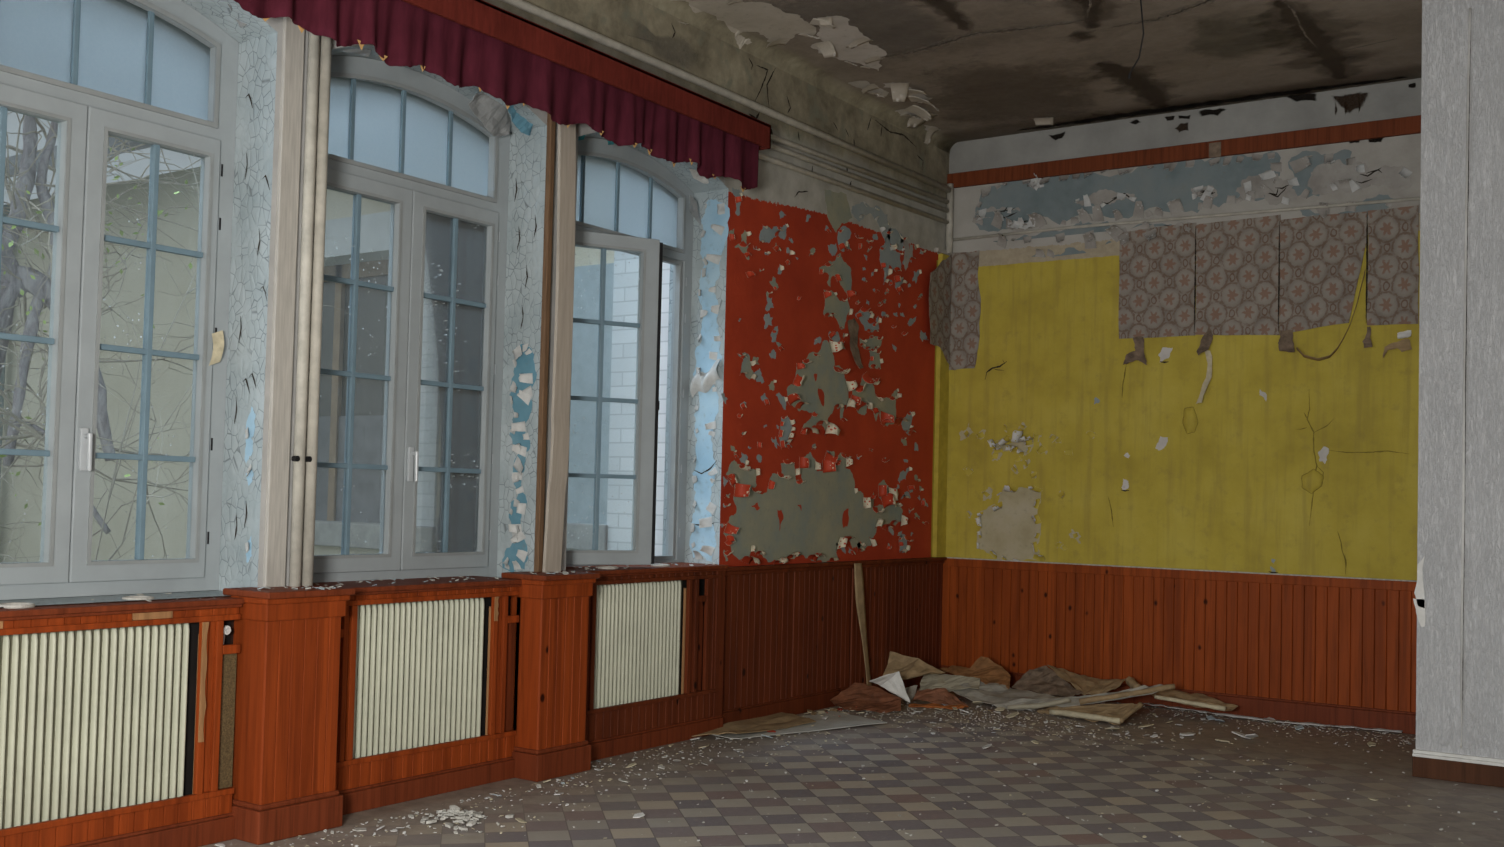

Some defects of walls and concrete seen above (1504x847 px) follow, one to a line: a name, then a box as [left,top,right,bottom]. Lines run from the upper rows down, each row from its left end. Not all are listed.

flaking render [671,0,941,145]
damp [1019,0,1416,140]
peeling [972,149,1393,258]
peeling [659,187,928,567]
peeling [424,343,627,582]
peeling [959,422,1064,562]
crack [1299,397,1408,574]
peeling [258,578,404,591]